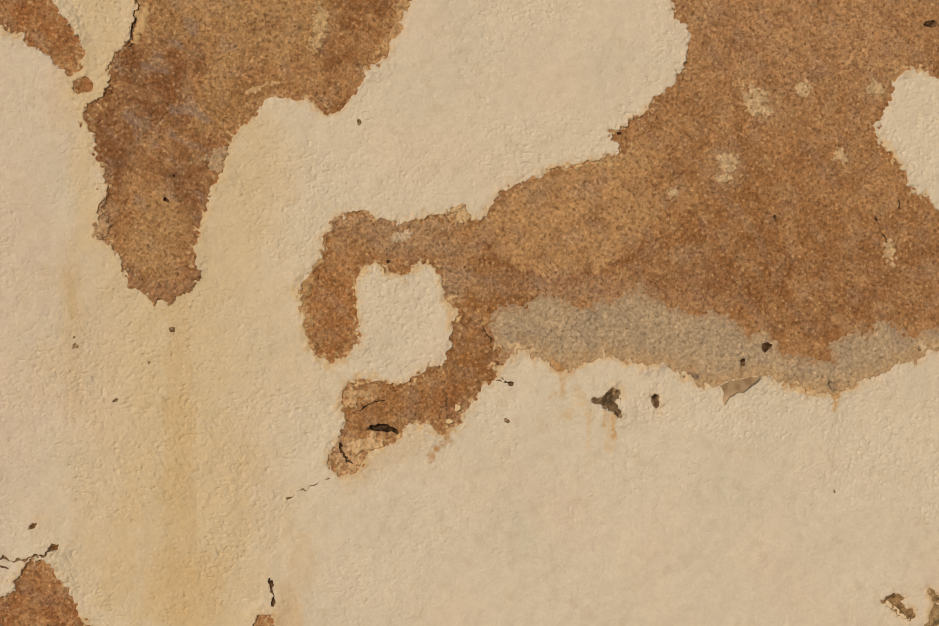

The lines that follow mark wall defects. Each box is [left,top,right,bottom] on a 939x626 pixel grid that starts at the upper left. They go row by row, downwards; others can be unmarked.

peeling [0,0,412,307]
peeling [299,0,939,477]
peeling [0,556,90,626]
peeling [253,615,274,626]